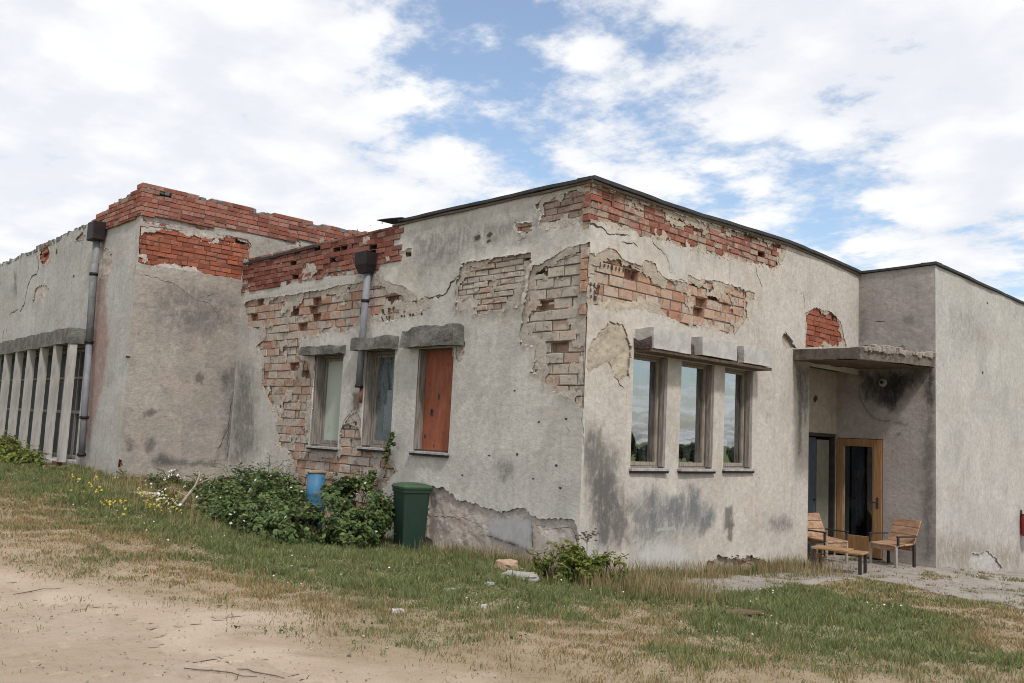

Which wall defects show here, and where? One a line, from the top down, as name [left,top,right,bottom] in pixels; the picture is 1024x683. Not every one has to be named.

spalling [515,183,788,271]
spalling [138,216,435,513]
spalling [449,242,755,409]
spalling [782,307,847,349]
spalling [863,344,936,368]
spalling [426,486,579,568]
water stain [582,433,712,570]
water stain [725,507,733,540]